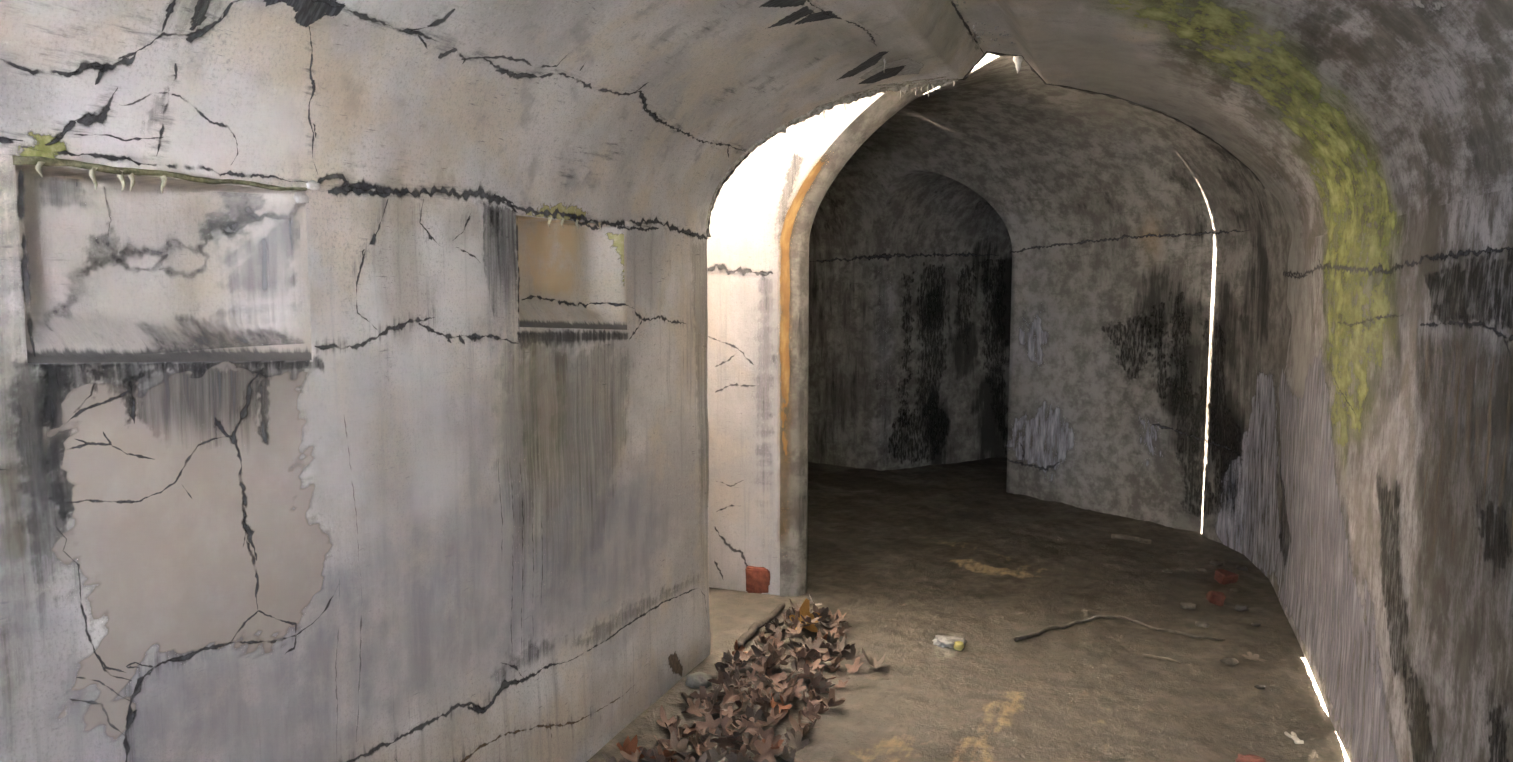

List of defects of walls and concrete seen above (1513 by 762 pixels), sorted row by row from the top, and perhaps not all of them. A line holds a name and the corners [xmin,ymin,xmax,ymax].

crack [0,0,773,350]
crack [522,295,755,393]
corrosion [779,157,829,464]
damp [888,259,1008,464]
damp [1102,292,1241,517]
crack [1283,247,1513,279]
crack [1337,314,1513,383]
damp [1425,250,1513,330]
crack [57,368,332,762]
crack [347,480,748,762]